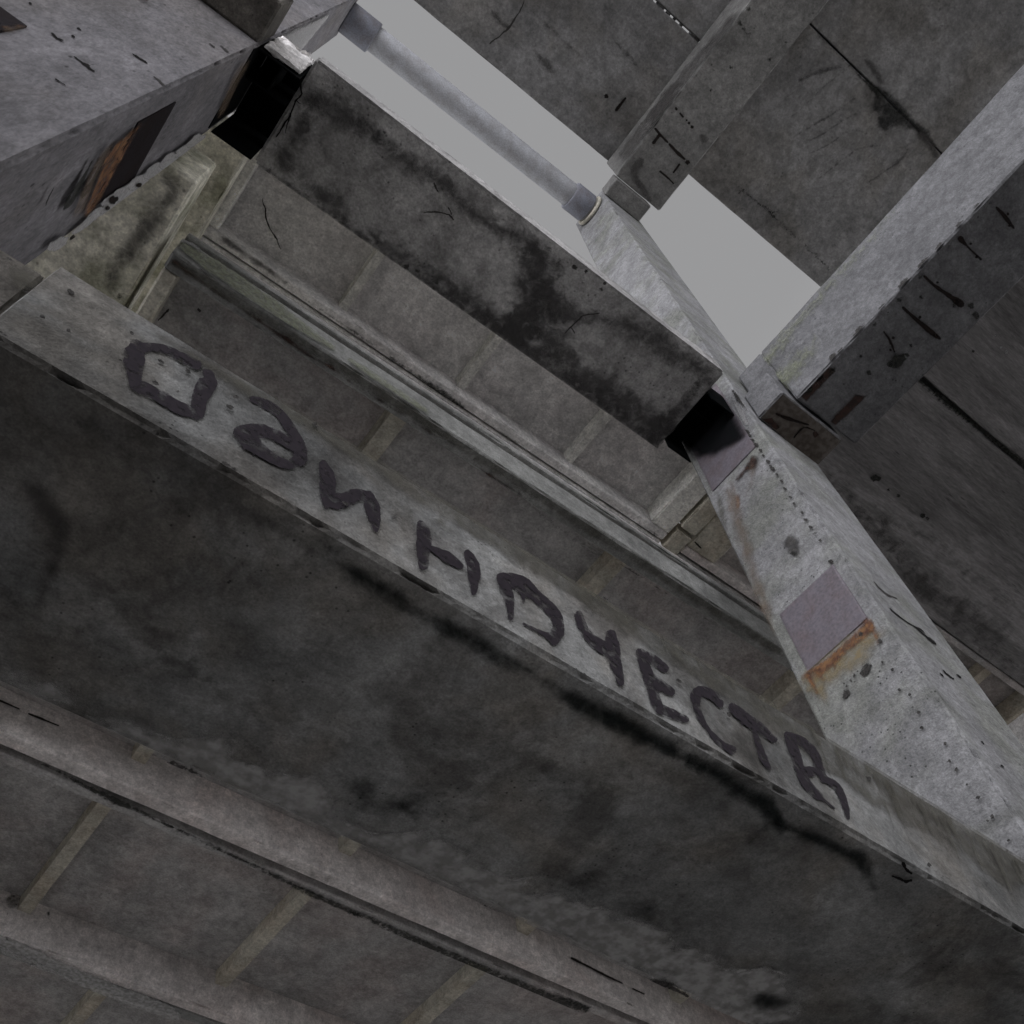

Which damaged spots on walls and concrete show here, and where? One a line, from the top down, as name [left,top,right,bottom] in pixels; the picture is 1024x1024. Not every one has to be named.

crack [489,2,524,44]
corrosion [76,128,138,214]
water stain [266,92,410,261]
crack [262,198,281,249]
water stain [389,147,712,448]
water stain [347,568,412,614]
water stain [433,618,529,671]
corrosion [805,619,877,695]
water stain [41,722,799,1024]